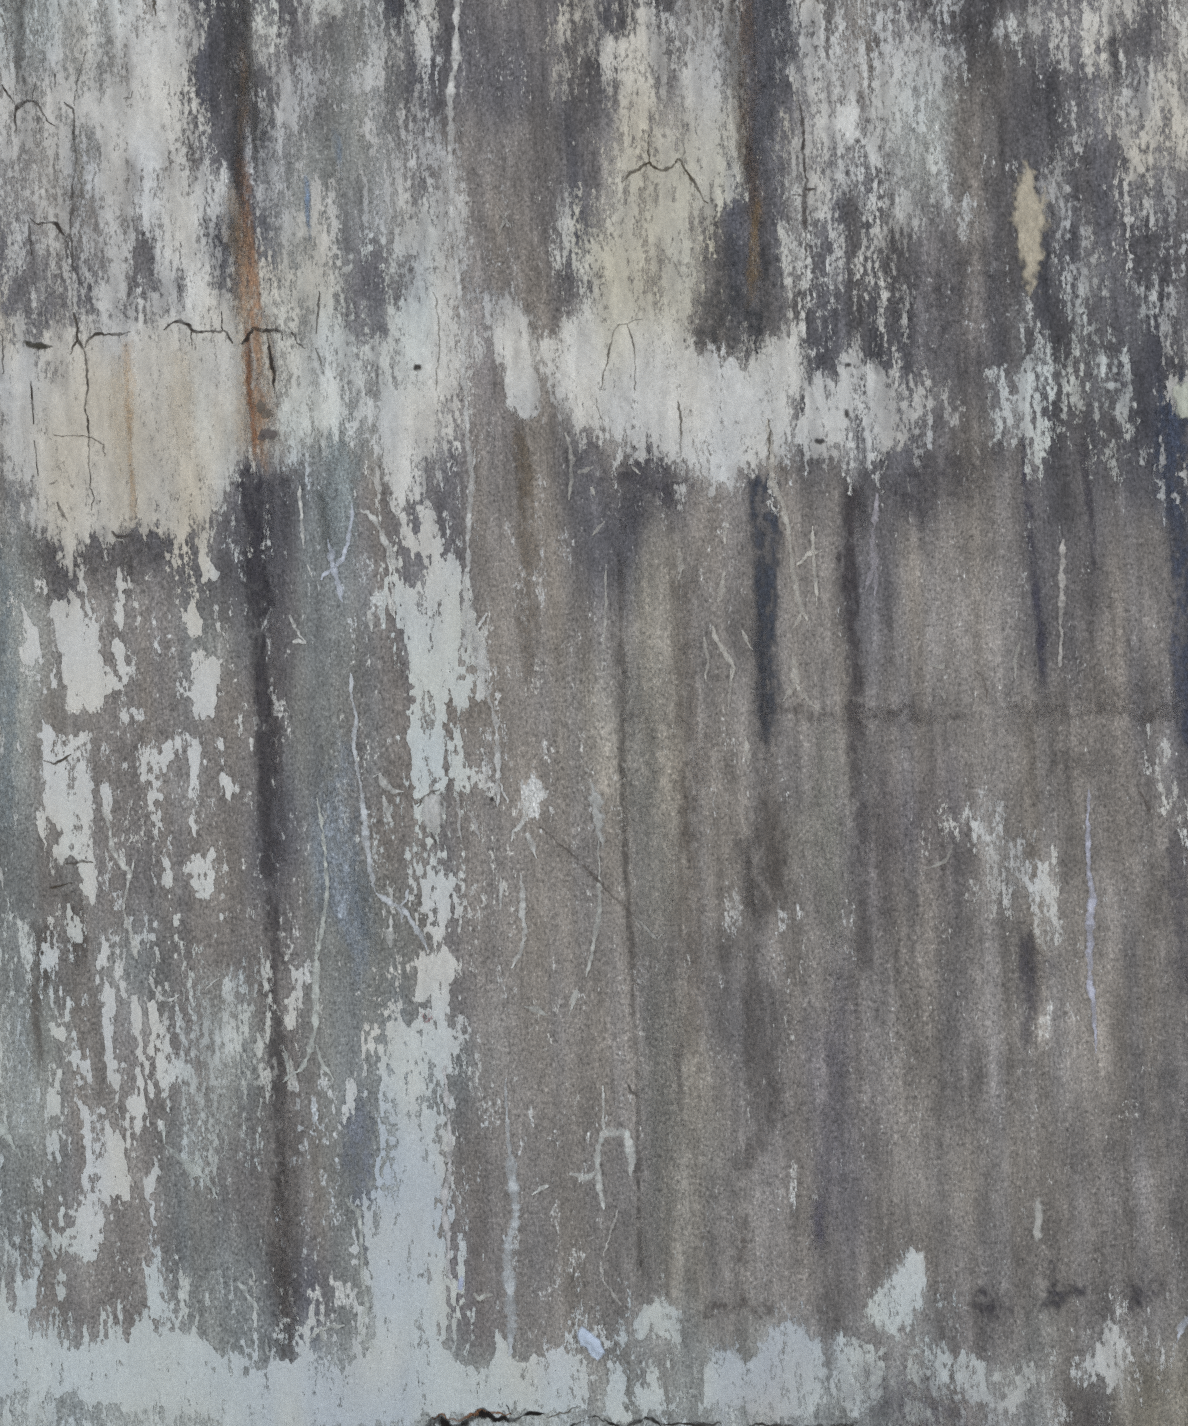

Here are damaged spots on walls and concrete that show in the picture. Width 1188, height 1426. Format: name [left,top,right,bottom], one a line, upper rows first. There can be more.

crack [1,51,325,543]
corrosion [237,183,263,452]
crack [621,134,708,203]
peeling [36,719,123,911]
peeling [112,729,202,889]
peeling [176,648,224,725]
water stain [236,469,279,1025]
water stain [751,475,780,733]
water stain [1157,393,1188,743]
peeling [0,899,305,1265]
crack [427,1405,857,1426]
peeling [698,1314,887,1426]